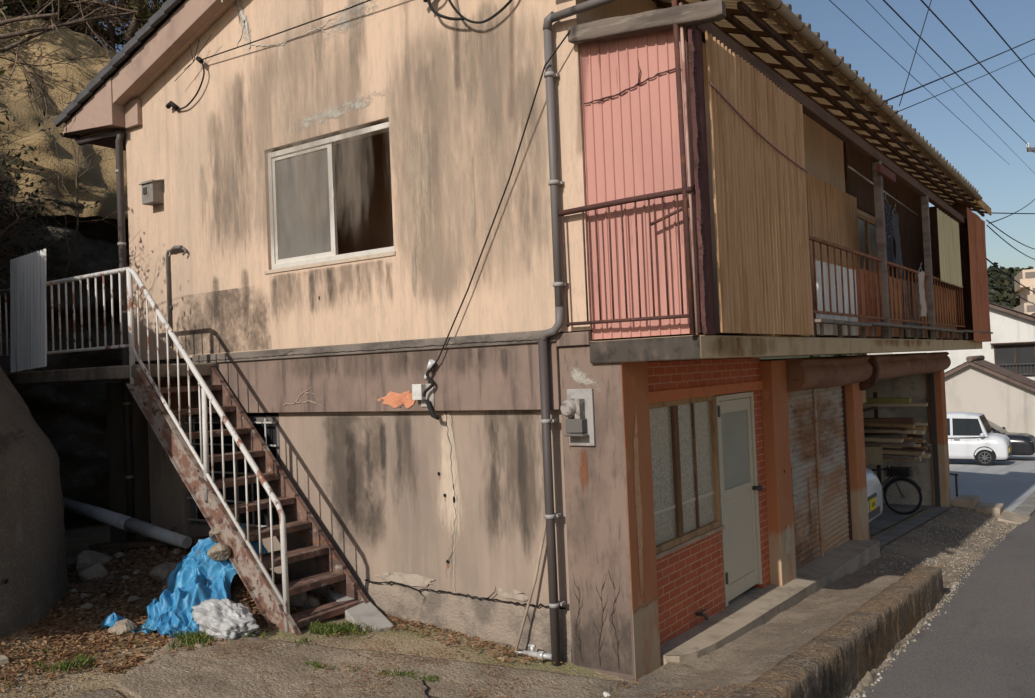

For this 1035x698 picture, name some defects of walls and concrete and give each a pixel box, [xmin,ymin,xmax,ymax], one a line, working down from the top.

crack [584,64,675,104]
water stain [183,290,241,355]
spalling [377,390,415,408]
water stain [329,417,385,534]
crack [365,412,658,669]